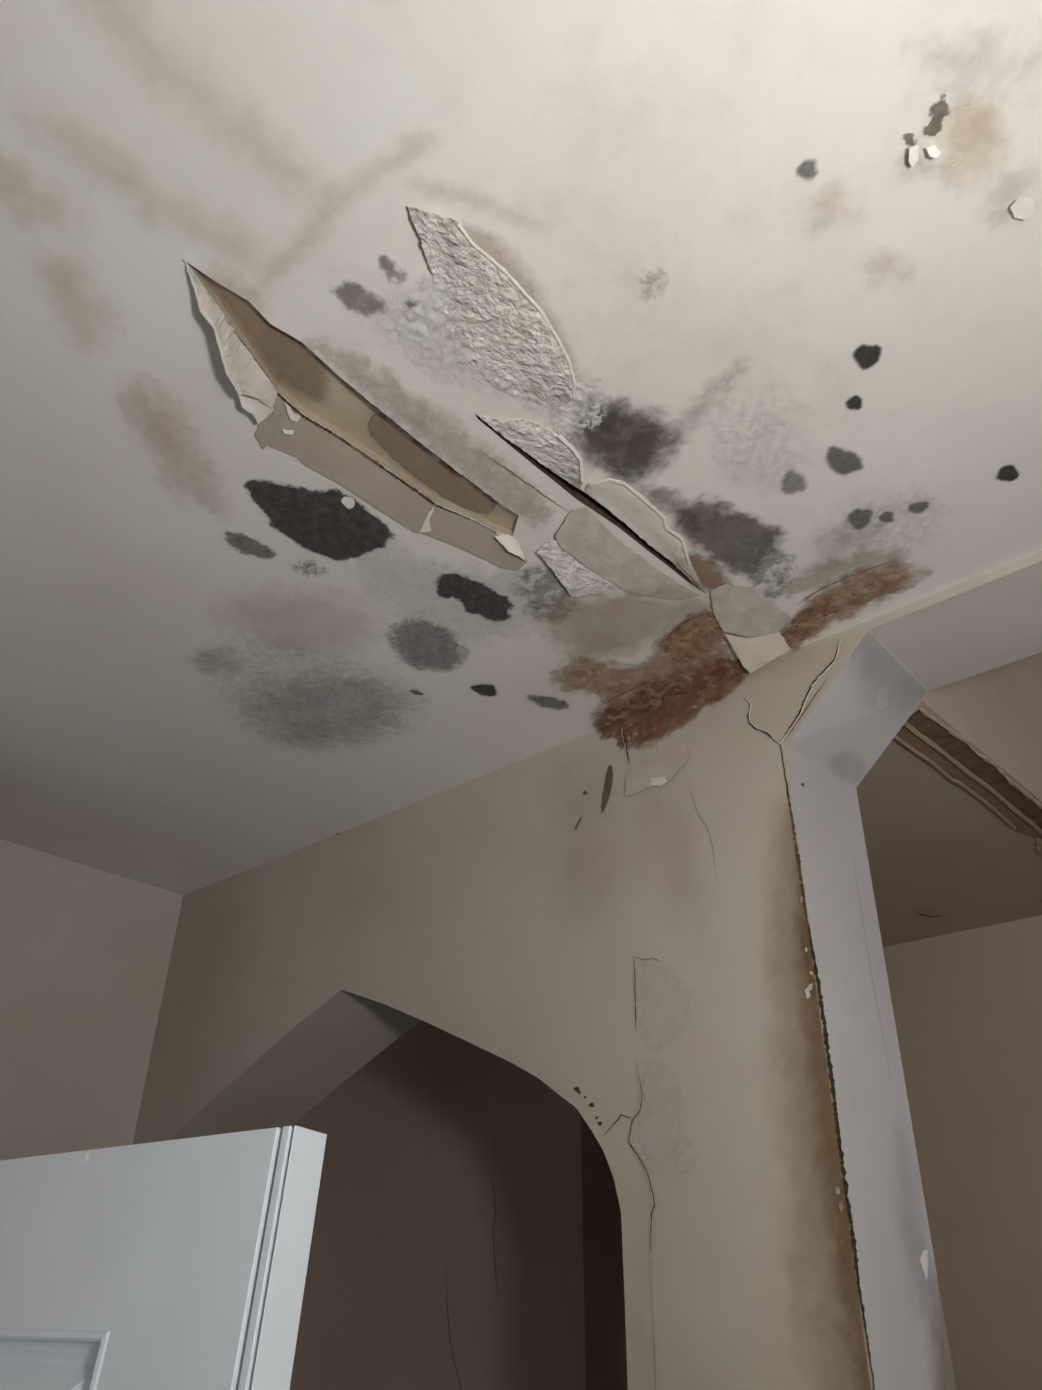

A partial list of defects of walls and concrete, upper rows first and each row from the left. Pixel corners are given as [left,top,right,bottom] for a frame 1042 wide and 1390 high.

damp [225,532,276,558]
damp [245,480,568,670]
spalling [183,259,791,673]
peeling [406,206,576,407]
damp [538,375,677,477]
damp [650,489,788,598]
mould [828,447,863,474]
mould [855,345,882,369]
damp [998,465,1019,481]
spalling [894,707,1042,854]
crack [744,640,875,1390]
crack [574,956,659,1390]